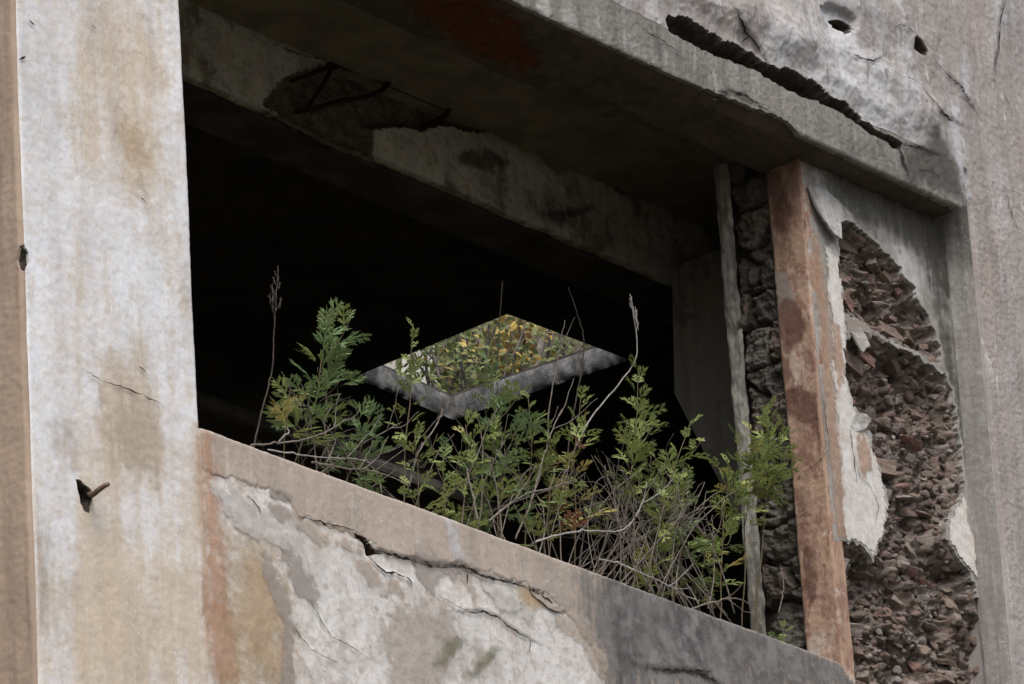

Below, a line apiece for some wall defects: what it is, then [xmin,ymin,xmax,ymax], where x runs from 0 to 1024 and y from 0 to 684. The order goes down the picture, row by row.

crack [738,15,761,52]
crack [713,91,758,104]
crack [853,54,953,121]
crack [933,58,970,101]
crack [82,366,162,404]
rust [811,237,846,538]
rust [857,434,871,477]
spalling [824,223,979,684]
peeling [209,480,321,684]
crack [298,516,553,604]
crack [296,612,369,662]
crack [441,597,531,652]